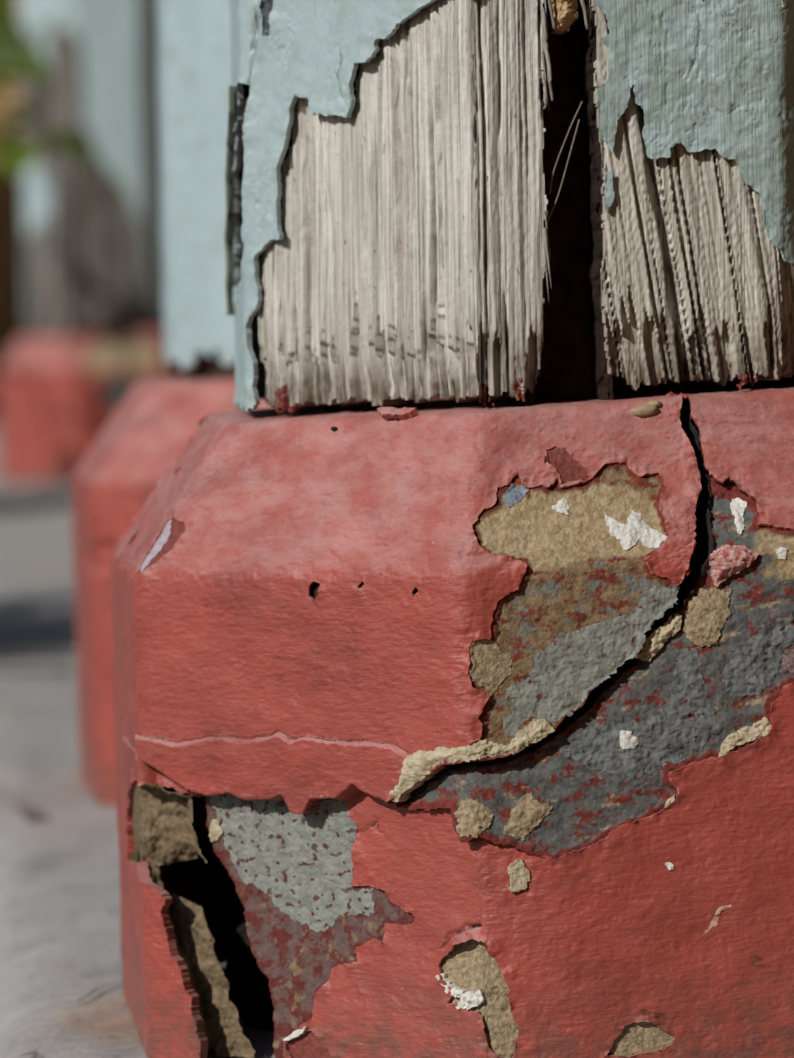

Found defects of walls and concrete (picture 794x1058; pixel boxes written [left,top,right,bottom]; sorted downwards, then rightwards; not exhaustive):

peeling [224,86,239,315]
peeling [280,98,298,183]
peeling [140,519,186,572]
crack [125,730,406,751]
crack [395,406,715,806]
spalling [389,444,794,892]
peeling [130,775,415,1058]
peeling [435,939,519,1058]